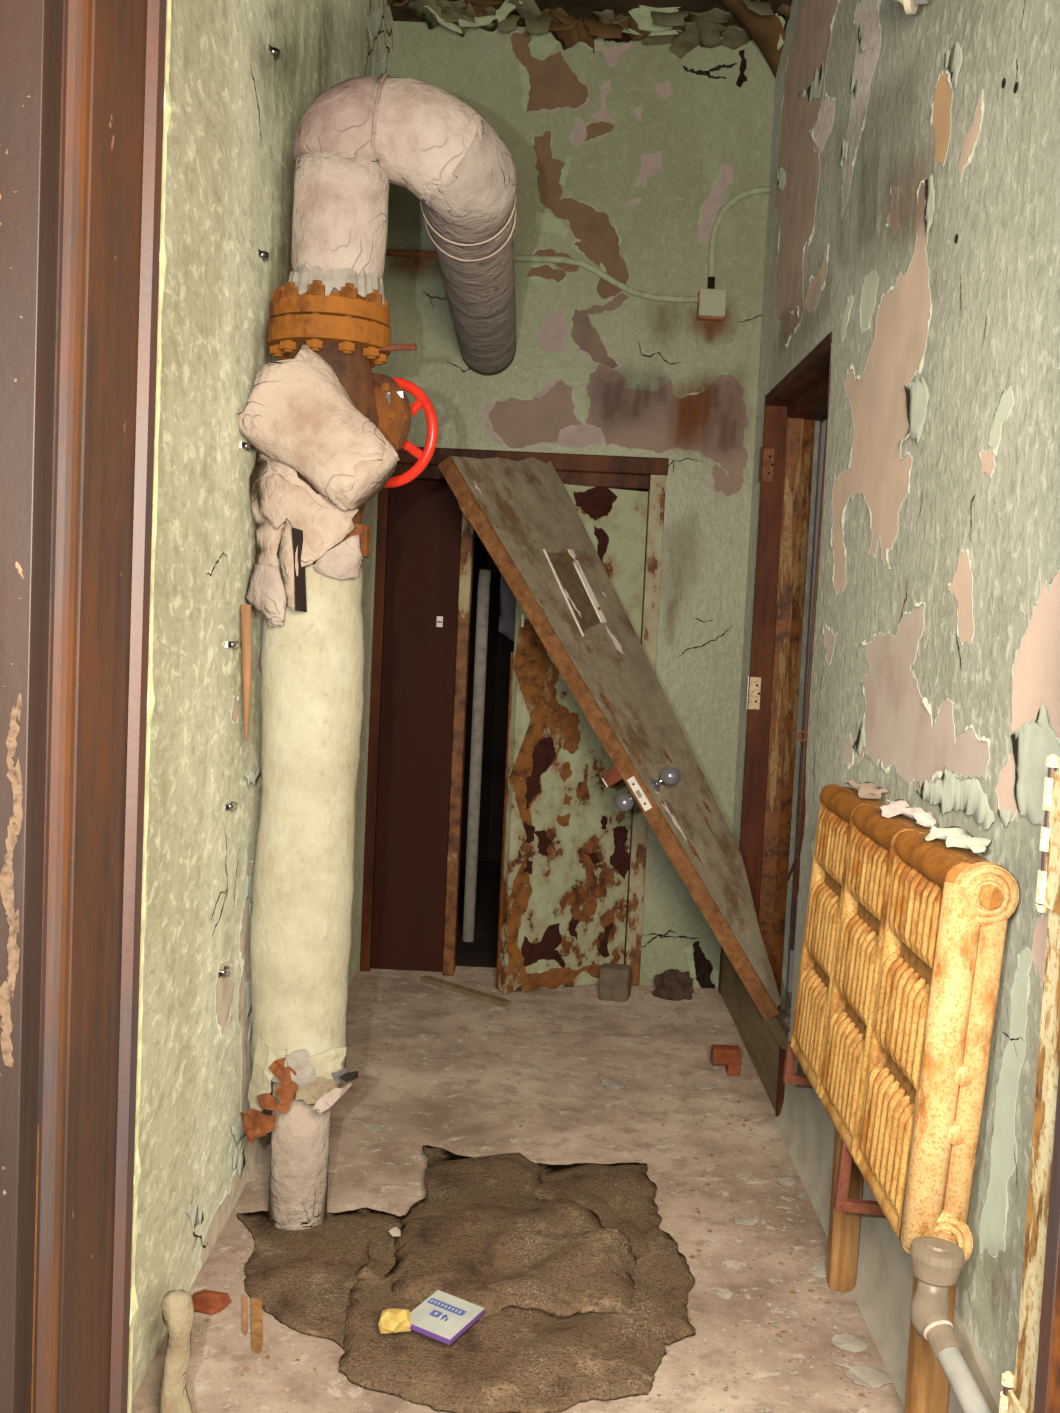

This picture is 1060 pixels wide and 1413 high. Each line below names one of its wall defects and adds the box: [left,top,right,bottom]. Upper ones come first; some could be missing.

crack [706,63,737,73]
peeling [364,0,881,497]
peeling [830,42,984,595]
peeling [979,385,1014,478]
crack [678,617,733,657]
peeling [823,623,837,666]
peeling [843,570,1060,829]
peeling [947,549,974,645]
peeling [792,733,816,901]
peeling [979,915,1048,1258]